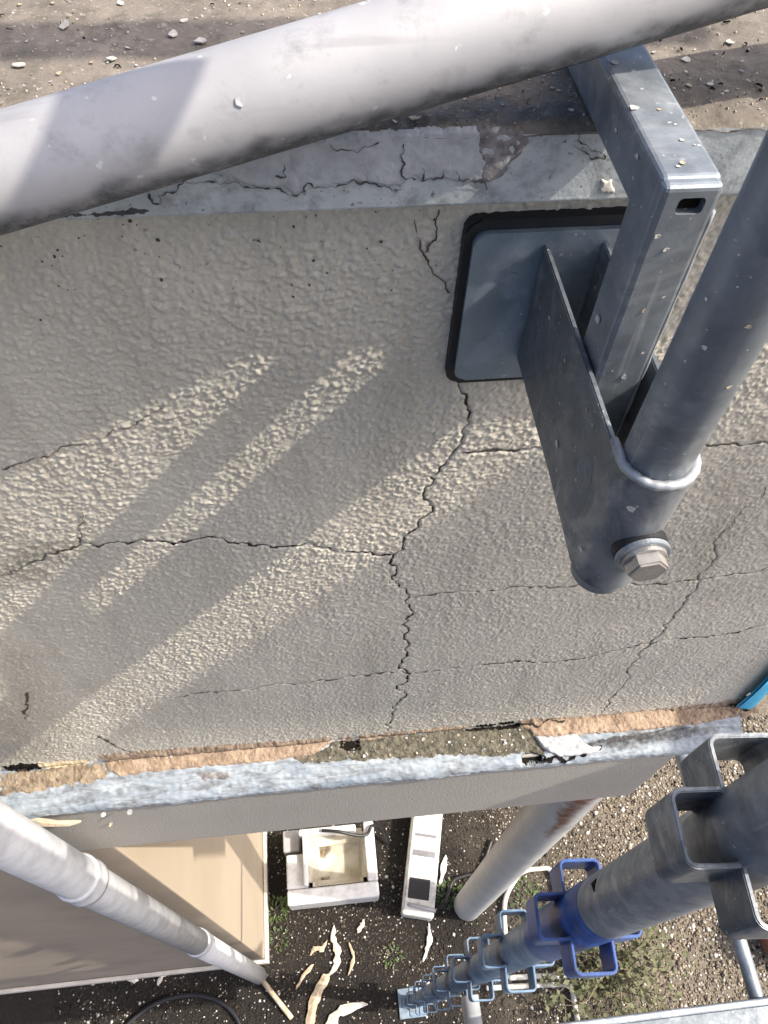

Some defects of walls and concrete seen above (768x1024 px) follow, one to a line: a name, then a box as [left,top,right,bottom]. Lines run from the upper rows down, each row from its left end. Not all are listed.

peeling [62,126,525,220]
crack [575,135,606,160]
crack [414,209,451,294]
crack [1,384,768,727]
spalling [0,695,759,796]